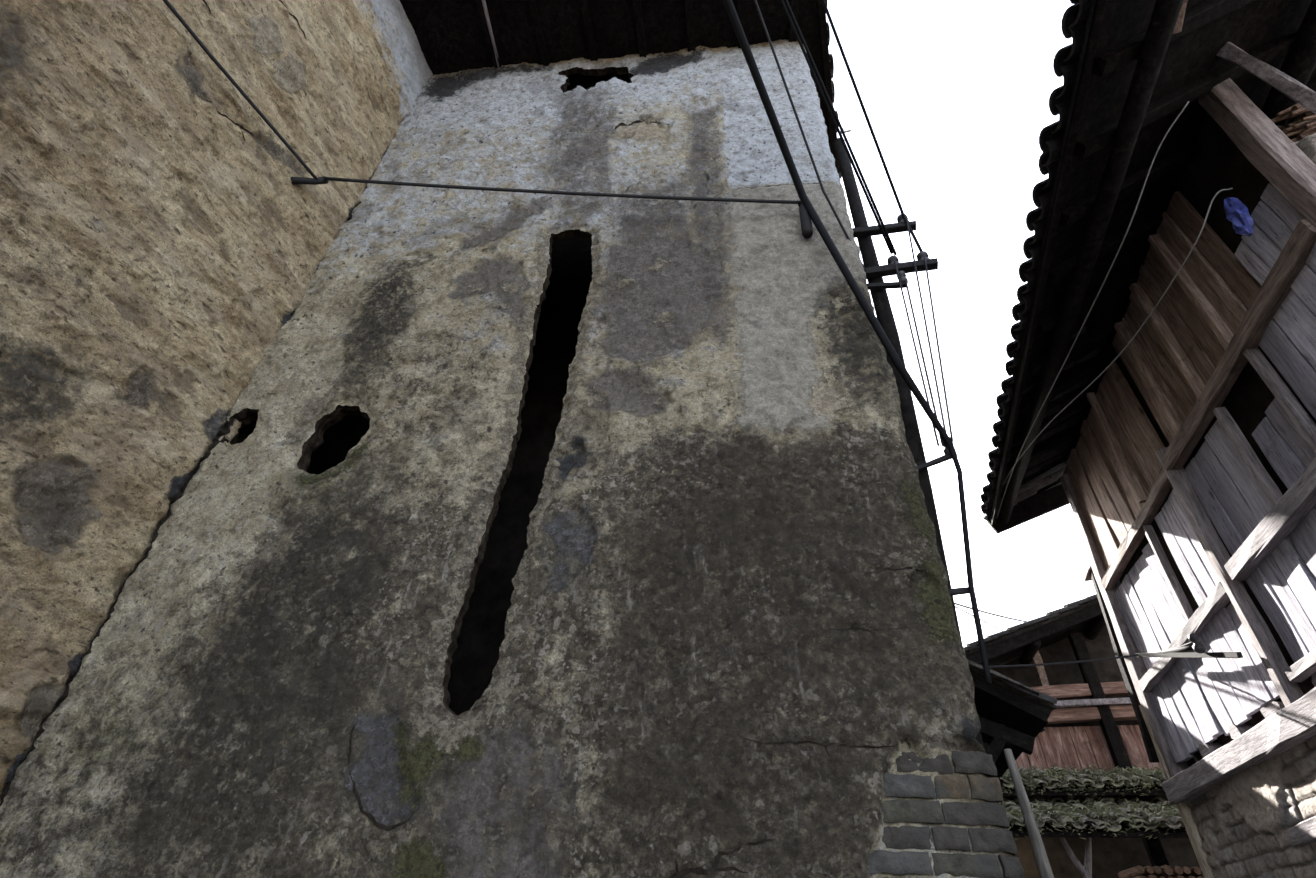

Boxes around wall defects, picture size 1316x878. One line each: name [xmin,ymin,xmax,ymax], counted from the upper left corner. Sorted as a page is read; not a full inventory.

water stain [554,87,731,342]
spalling [203,408,237,440]
spalling [283,379,342,452]
crack [411,227,606,760]
water stain [85,482,397,878]
water stain [442,719,561,878]
water stain [607,425,928,878]